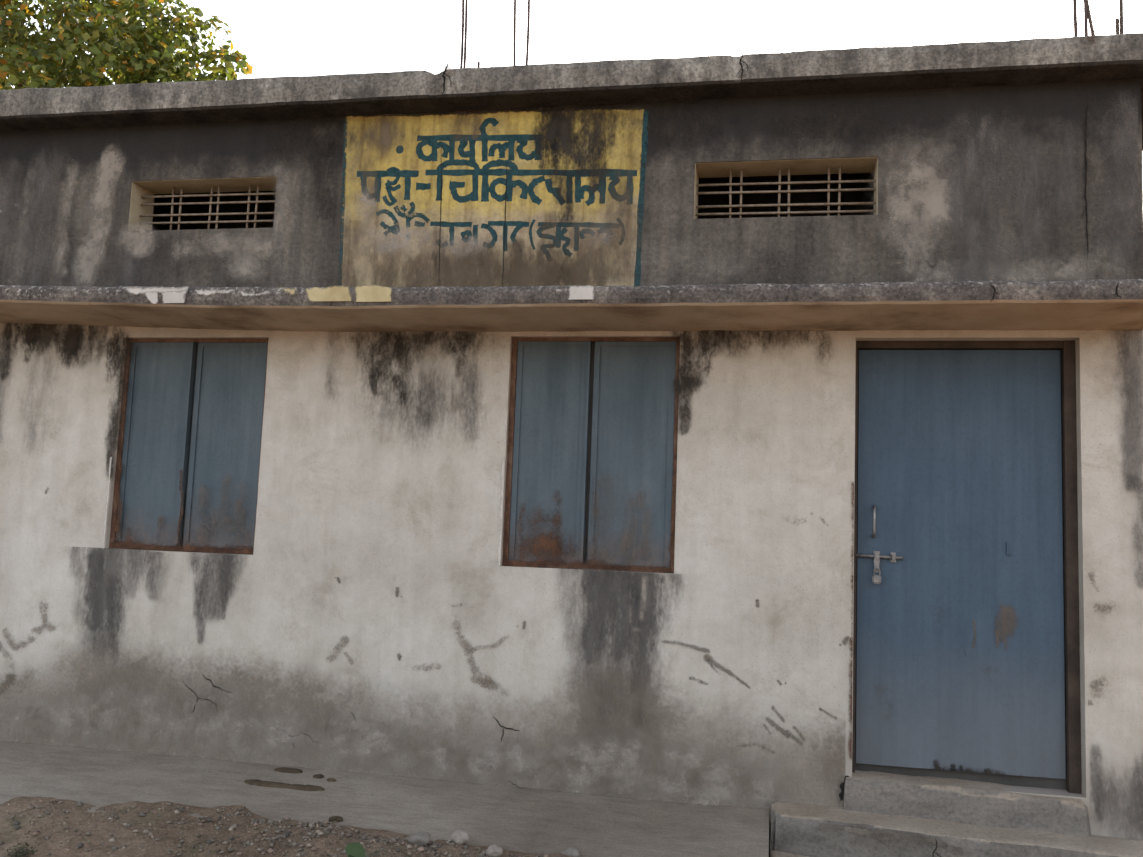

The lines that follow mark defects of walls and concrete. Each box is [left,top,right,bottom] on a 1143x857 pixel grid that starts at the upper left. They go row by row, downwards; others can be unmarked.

water stain [0,323,131,478]
water stain [356,331,476,419]
water stain [674,330,808,434]
rust [503,437,668,573]
water stain [73,547,160,651]
water stain [195,553,238,642]
water stain [0,569,712,801]